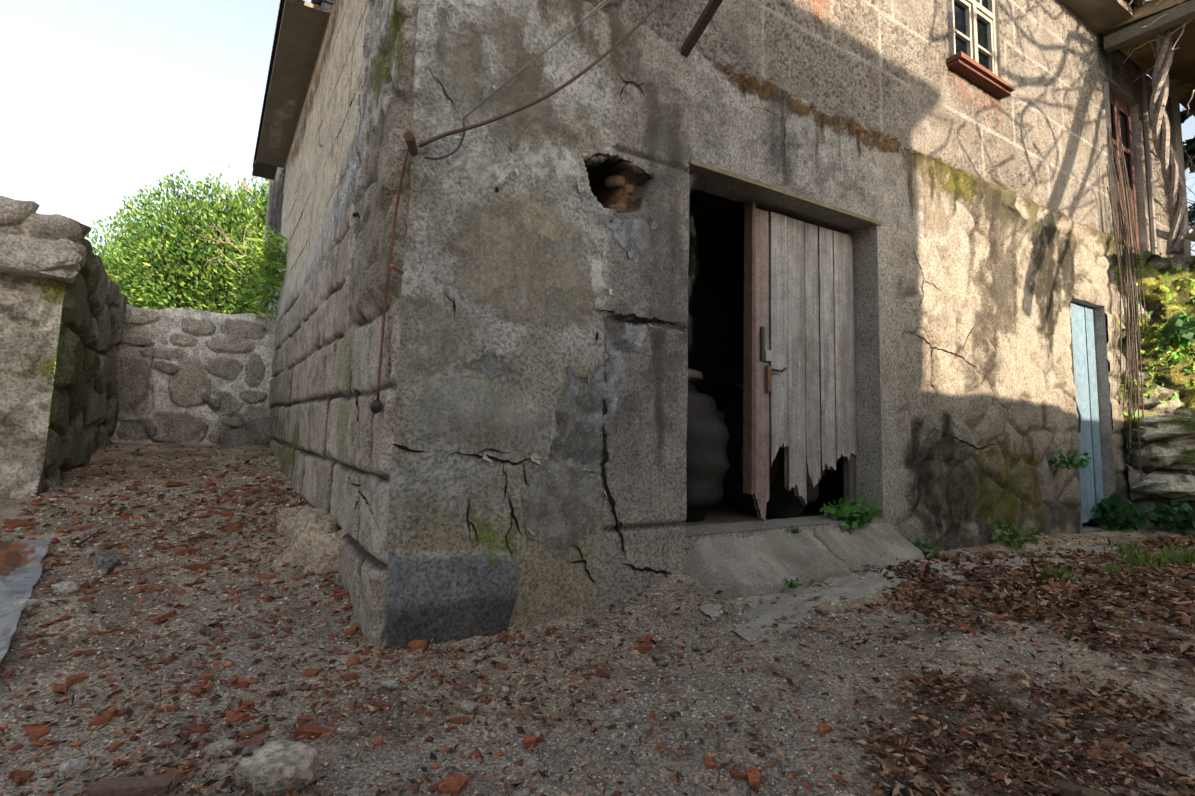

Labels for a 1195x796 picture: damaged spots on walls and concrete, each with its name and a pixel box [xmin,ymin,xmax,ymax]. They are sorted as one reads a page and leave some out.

corrosion [810,0,828,26]
spalling [443,139,658,473]
crack [589,308,682,578]
crack [393,444,541,557]
crack [566,545,597,584]